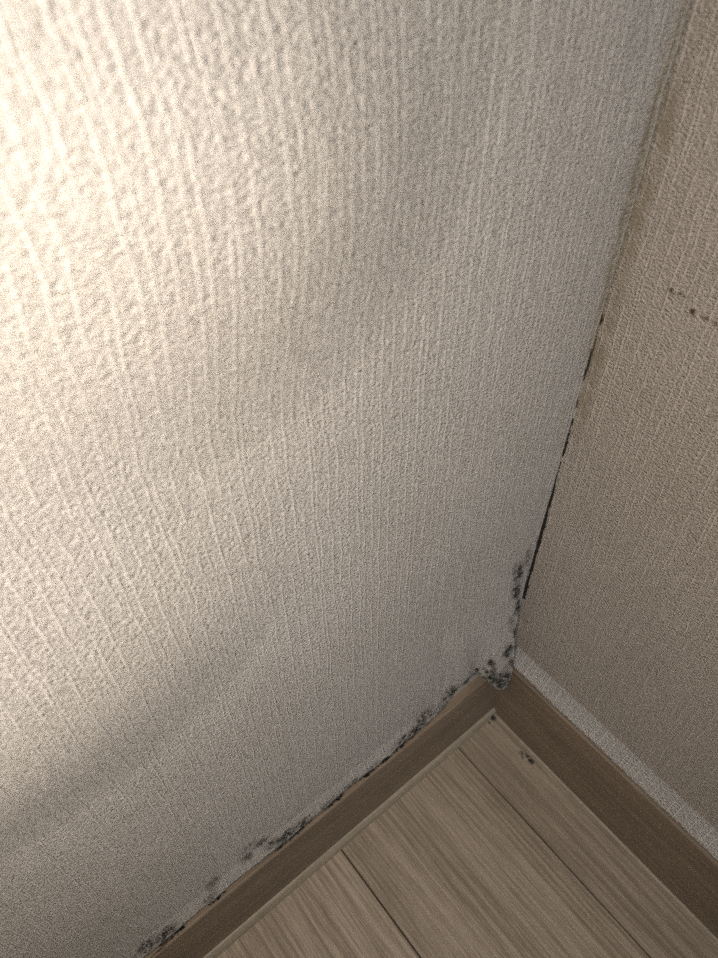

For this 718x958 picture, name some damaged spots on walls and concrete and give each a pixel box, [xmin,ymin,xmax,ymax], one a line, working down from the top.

damp [512,553,529,612]
damp [321,630,516,810]
damp [241,815,312,863]
damp [130,925,185,957]